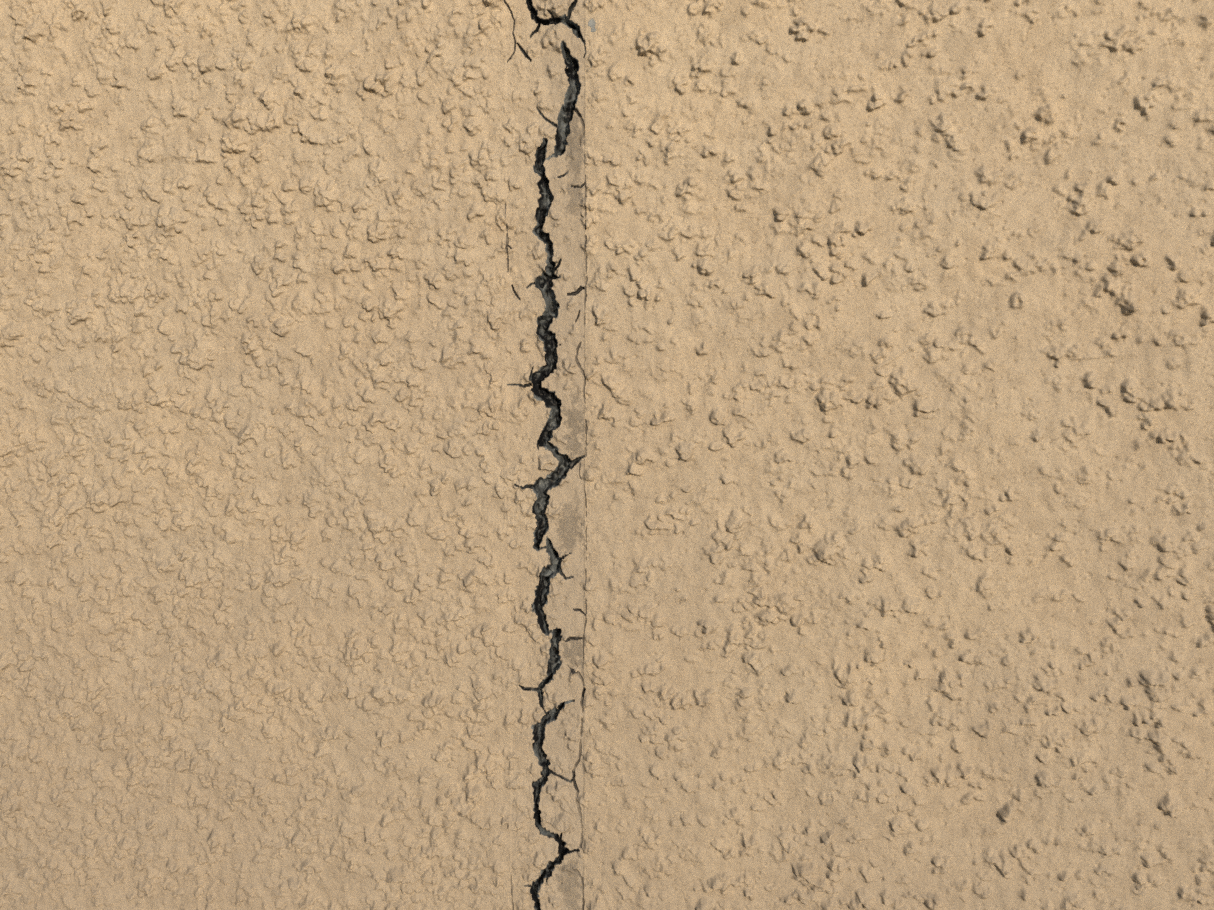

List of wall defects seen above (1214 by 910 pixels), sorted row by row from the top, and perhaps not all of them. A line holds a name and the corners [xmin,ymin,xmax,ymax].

crack [504,0,588,910]